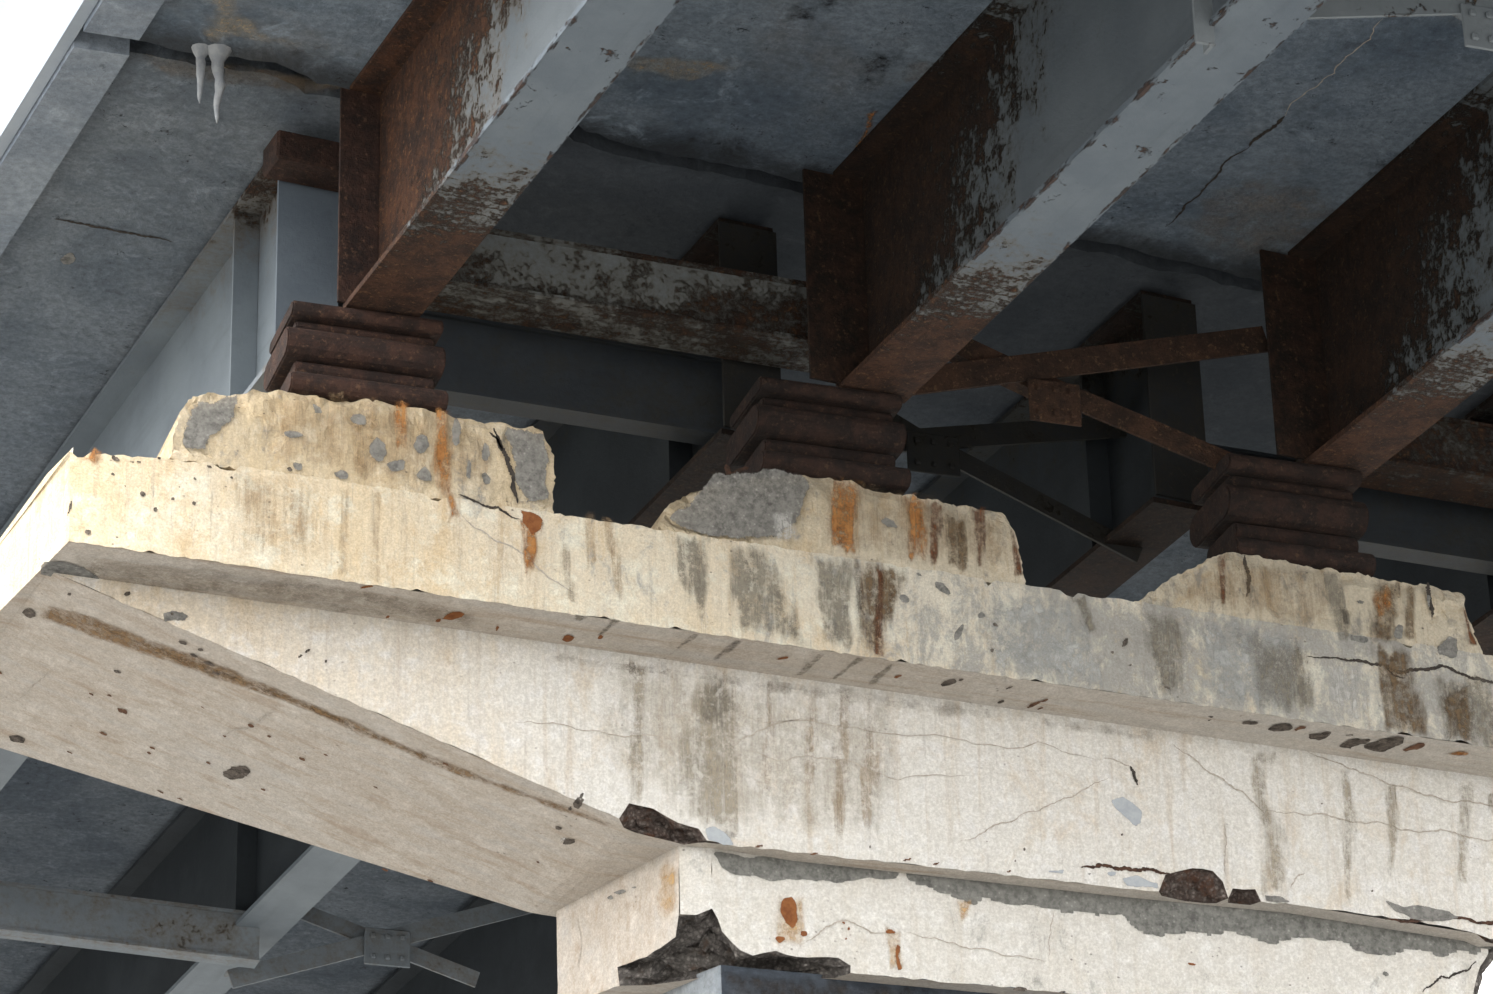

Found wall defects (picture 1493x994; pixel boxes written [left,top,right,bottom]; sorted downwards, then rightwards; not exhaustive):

crack [1165,20,1381,227]
crack [458,428,575,595]
corrosion [521,510,543,573]
water stain [678,539,706,618]
water stain [719,551,797,655]
water stain [819,562,904,684]
corrosion [905,495,942,563]
crack [1307,656,1493,684]
water stain [681,684,736,822]
corrosion [776,897,807,943]
corrosion [886,929,902,970]
peeling [617,803,1493,994]